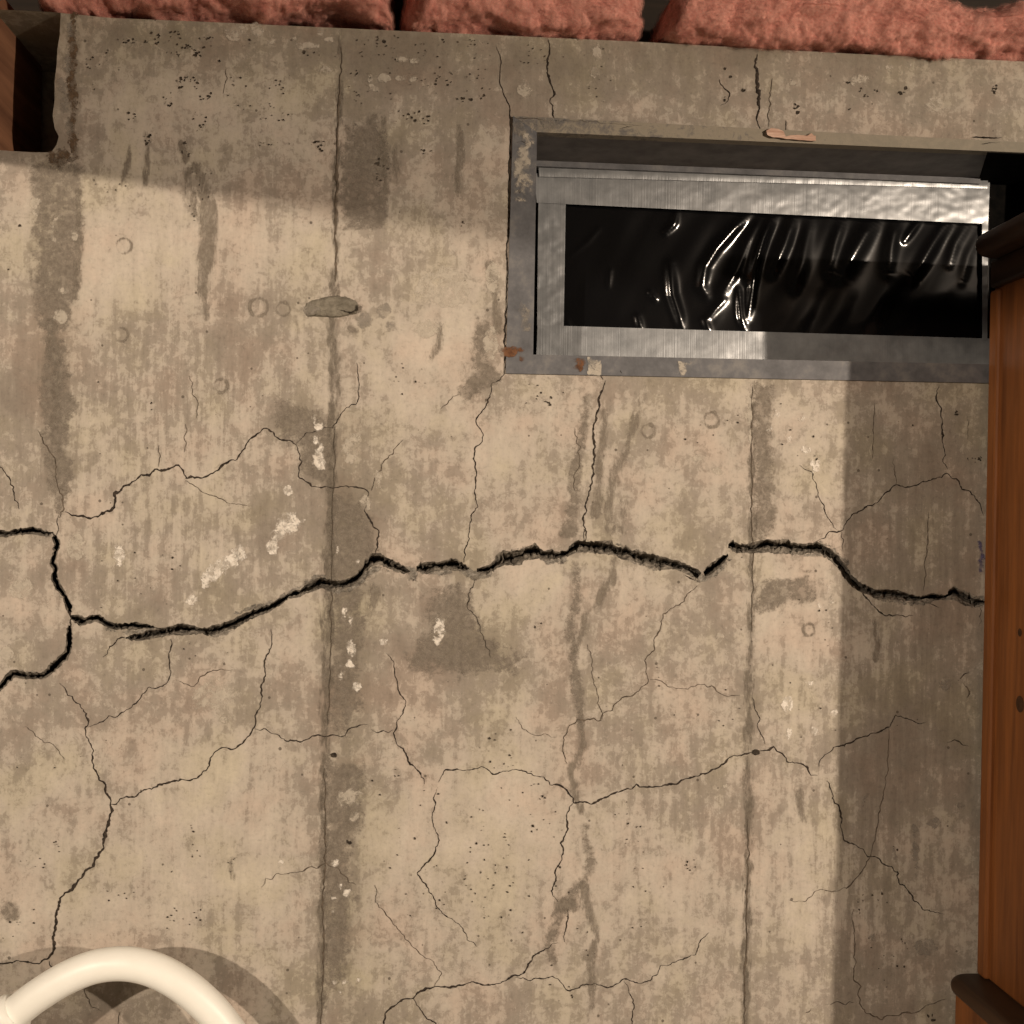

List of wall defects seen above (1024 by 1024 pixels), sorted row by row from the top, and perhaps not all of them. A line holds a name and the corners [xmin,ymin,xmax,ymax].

crack [754,54,787,128]
damp [338,114,399,229]
crack [497,49,511,347]
damp [30,158,84,513]
damp [409,583,519,674]
crack [0,356,984,967]
crack [375,887,706,1024]
crack [806,912,945,1020]